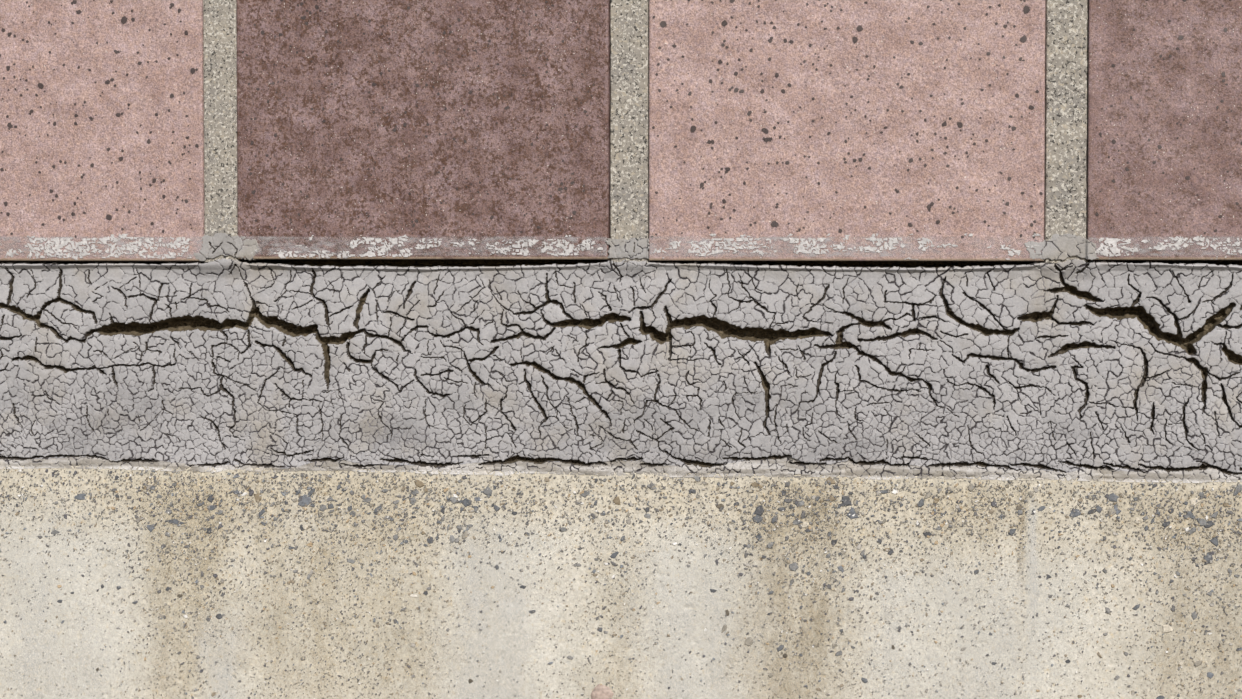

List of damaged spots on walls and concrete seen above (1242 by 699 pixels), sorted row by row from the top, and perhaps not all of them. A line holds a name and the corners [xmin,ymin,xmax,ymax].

peeling [1,234,192,260]
peeling [252,234,603,258]
peeling [650,234,973,260]
peeling [987,234,1041,260]
peeling [1095,236,1242,258]
crack [0,234,1242,483]